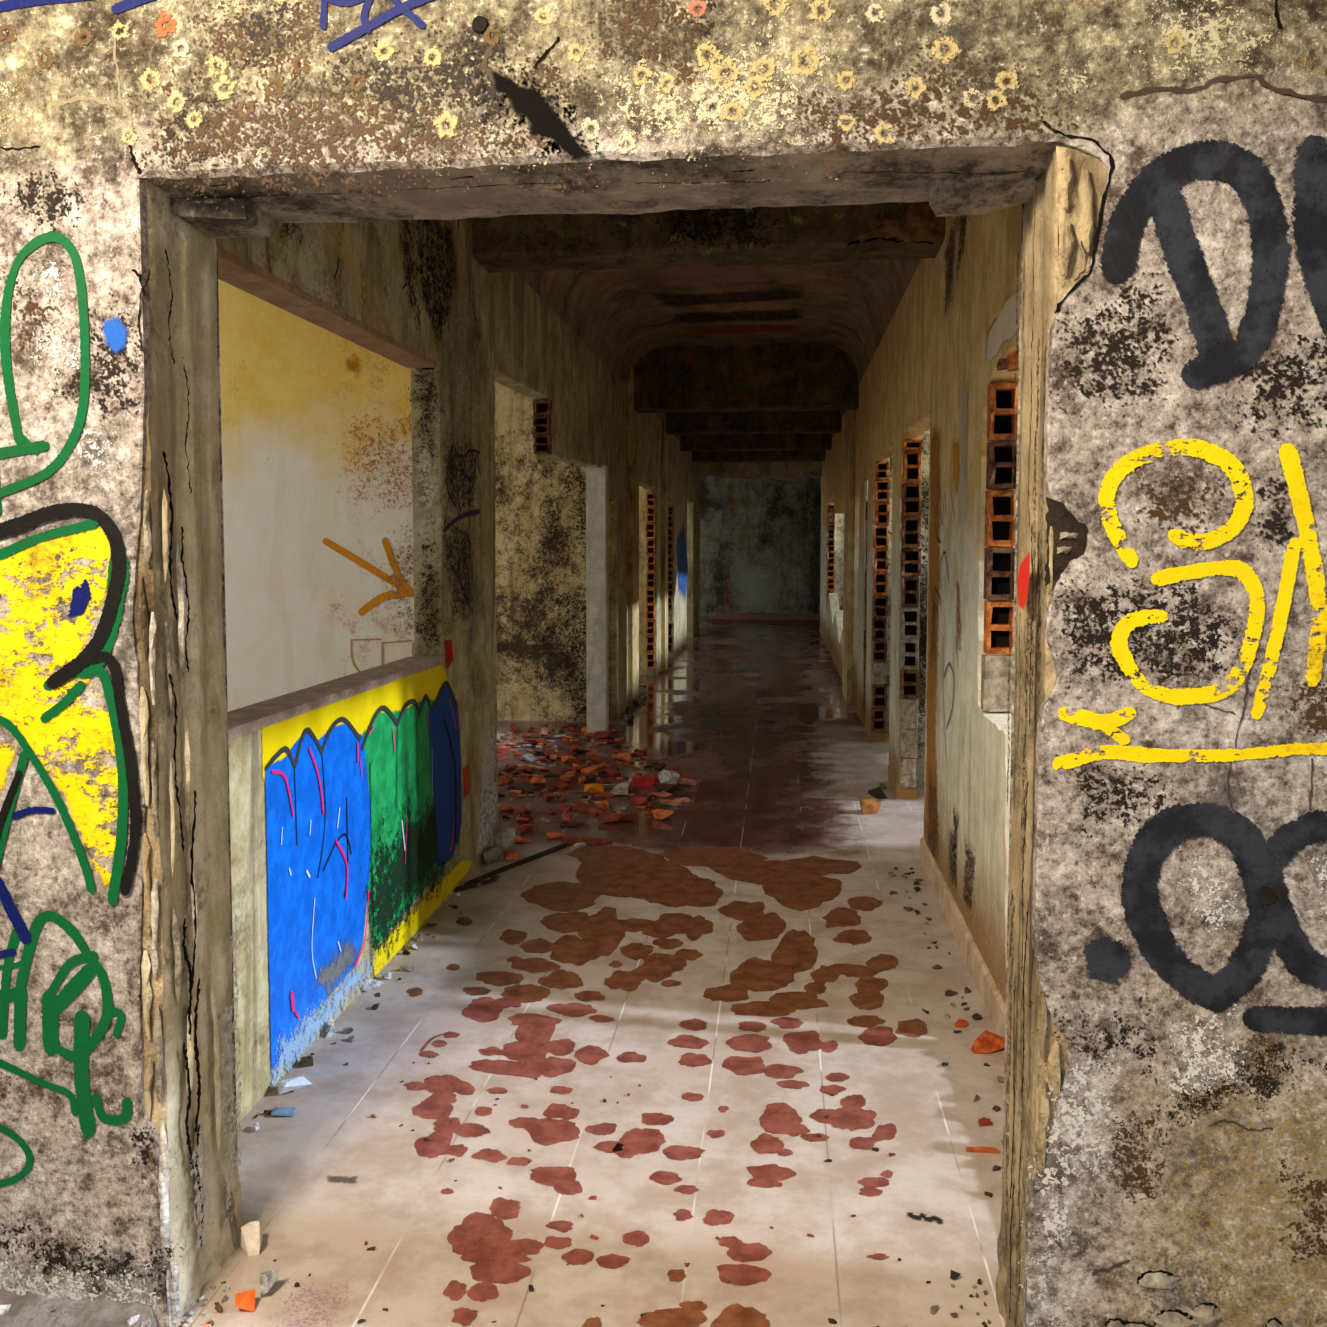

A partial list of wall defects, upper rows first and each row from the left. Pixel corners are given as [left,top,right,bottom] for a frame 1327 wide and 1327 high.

crack [0,144,40,152]
crack [183,184,344,279]
crack [405,36,771,228]
crack [841,168,971,176]
crack [1120,60,1327,102]
crack [1274,0,1282,29]
leakage [512,460,587,722]
flaking render [981,288,1020,712]
crack [1017,121,1115,746]
crack [131,248,204,1247]
crack [1009,782,1029,1320]